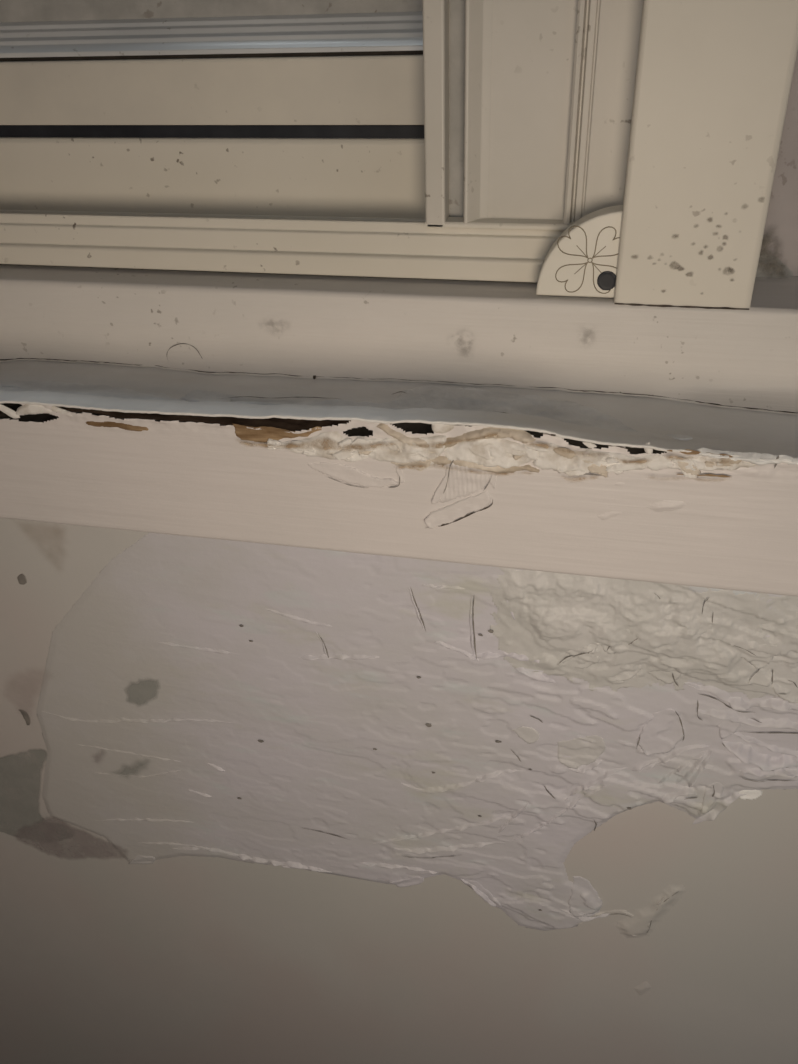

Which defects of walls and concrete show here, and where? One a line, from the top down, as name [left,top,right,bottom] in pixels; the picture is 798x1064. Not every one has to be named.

peeling [240,423,798,529]
crack [409,587,426,631]
crack [469,594,477,659]
crack [672,673,798,740]